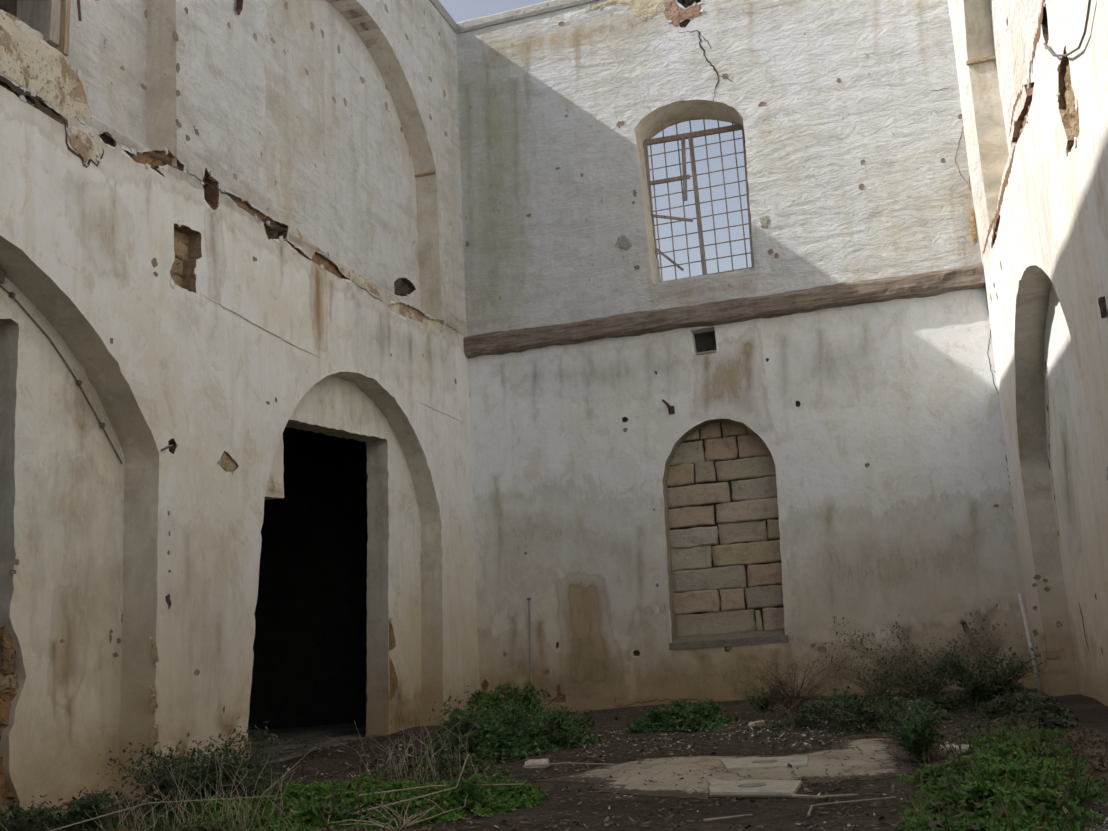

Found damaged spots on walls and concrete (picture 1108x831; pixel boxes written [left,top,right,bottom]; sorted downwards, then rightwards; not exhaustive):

peeling [0,11,184,177]
peeling [583,0,703,28]
crack [678,30,734,101]
crack [955,126,972,191]
crack [983,0,1045,253]
spalling [1039,2,1049,49]
spalling [1056,42,1080,157]
spalling [151,220,202,293]
spalling [200,168,445,334]
spalling [217,451,239,475]
spalling [0,624,19,741]
damp [568,582,609,686]